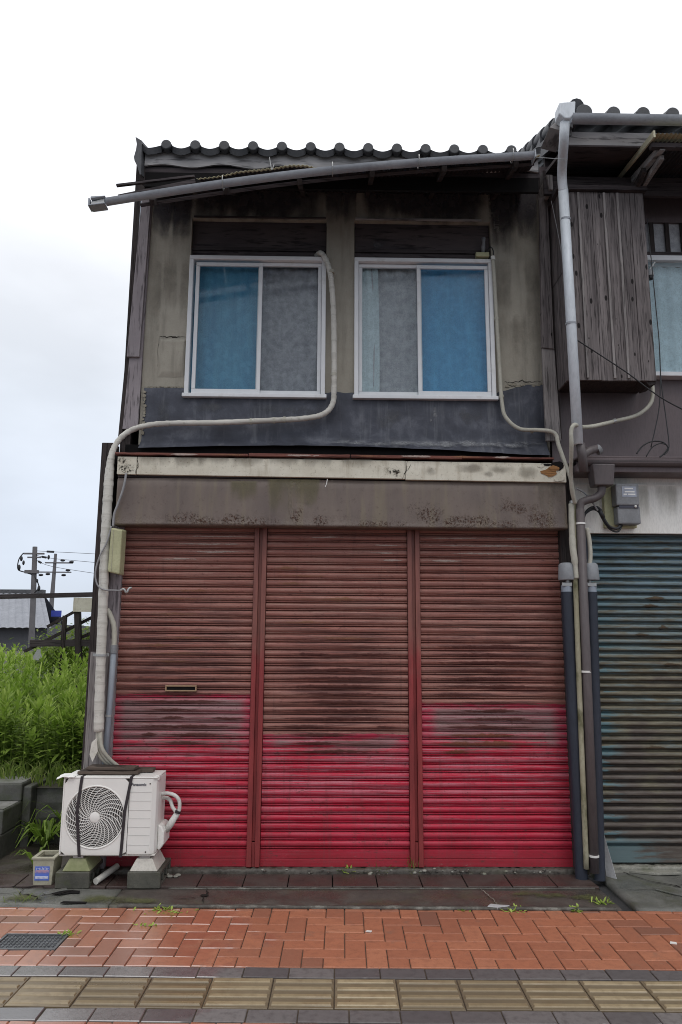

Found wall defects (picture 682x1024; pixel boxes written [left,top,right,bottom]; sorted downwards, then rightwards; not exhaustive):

spalling [537,461,565,482]